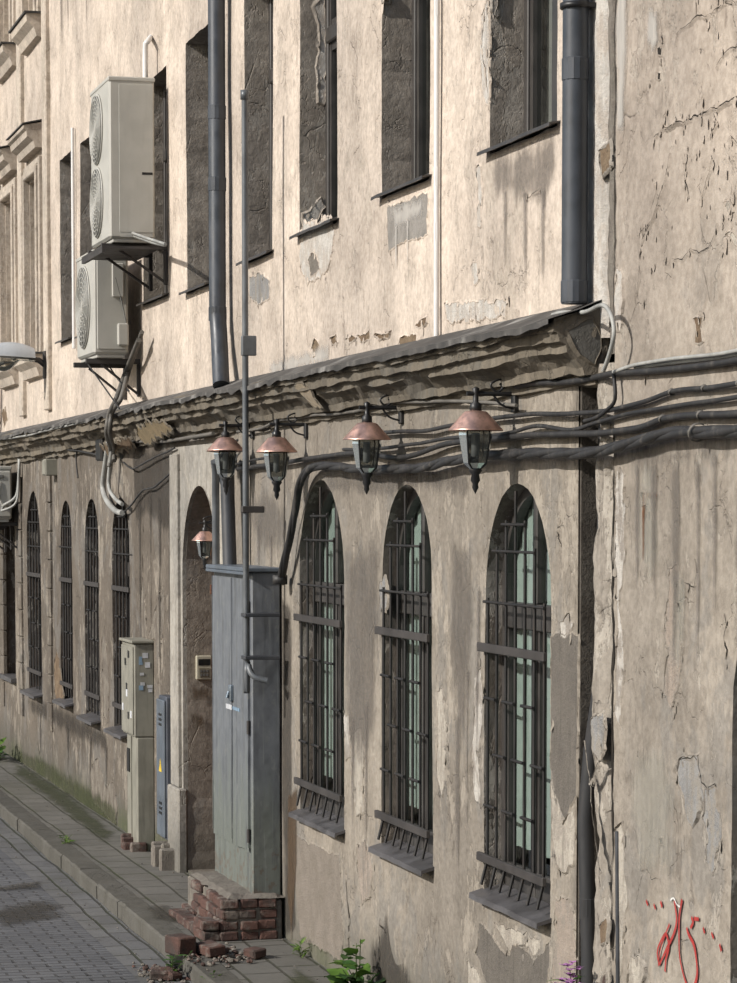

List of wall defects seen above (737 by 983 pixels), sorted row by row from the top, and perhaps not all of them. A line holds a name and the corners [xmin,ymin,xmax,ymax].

crack [613,0,737,312]
flaking render [299,196,335,287]
flaking render [444,295,509,326]
flaking render [549,465,627,877]
damp [32,703,107,772]
flaking render [674,750,724,876]
flaking render [467,942,487,983]
flaking render [478,894,578,983]
flaking render [595,820,648,983]